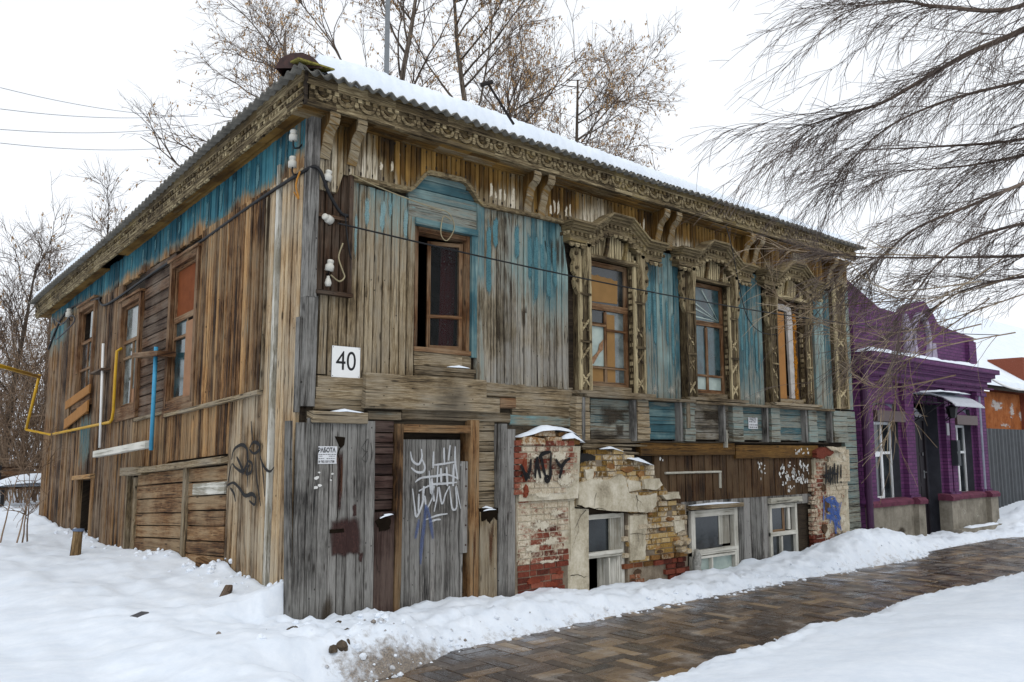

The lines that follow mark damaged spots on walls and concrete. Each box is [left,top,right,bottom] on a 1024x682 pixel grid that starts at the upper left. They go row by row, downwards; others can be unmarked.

peeling [490,183,515,201]
peeling [550,200,571,216]
peeling [486,218,498,293]
peeling [514,225,557,300]
peeling [647,280,675,365]
peeling [526,509,564,587]
peeling [521,451,574,498]
spalling [821,484,830,538]